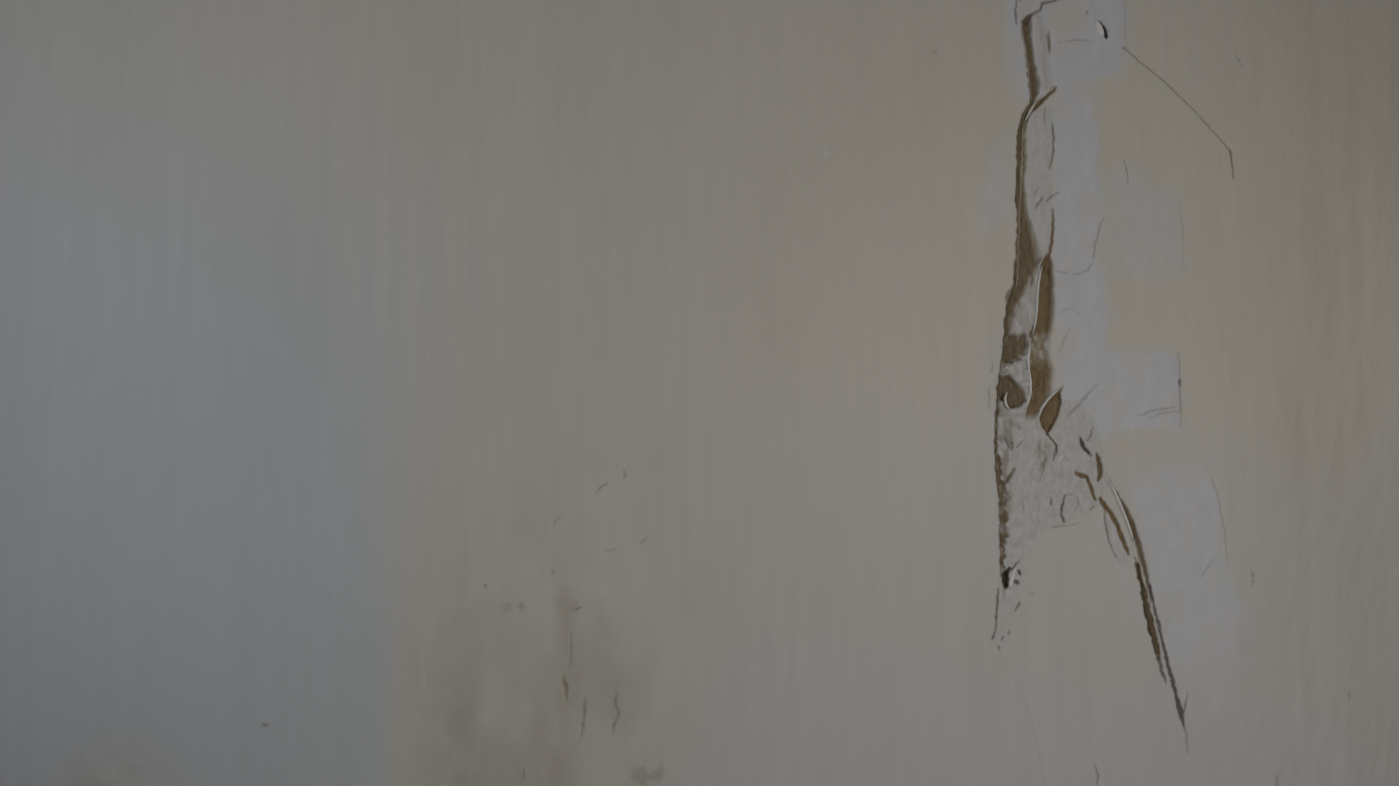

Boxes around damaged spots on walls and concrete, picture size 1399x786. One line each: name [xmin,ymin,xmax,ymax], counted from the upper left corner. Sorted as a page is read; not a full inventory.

flaking render [975,0,1190,786]